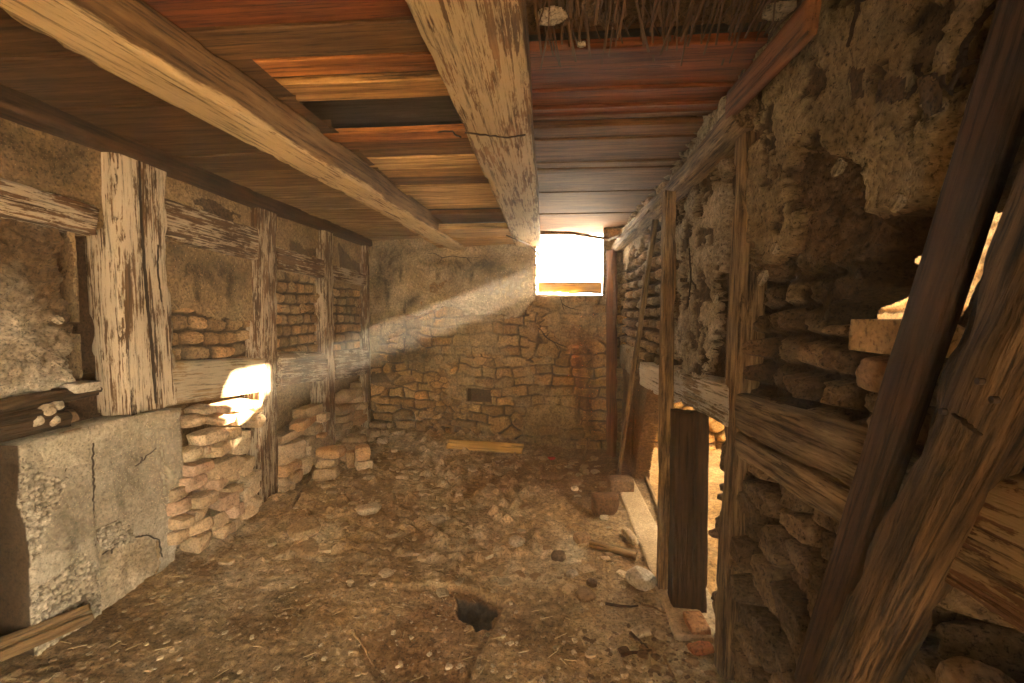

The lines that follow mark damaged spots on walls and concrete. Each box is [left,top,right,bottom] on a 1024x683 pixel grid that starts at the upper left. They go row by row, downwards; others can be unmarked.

crack [91,443,163,557]